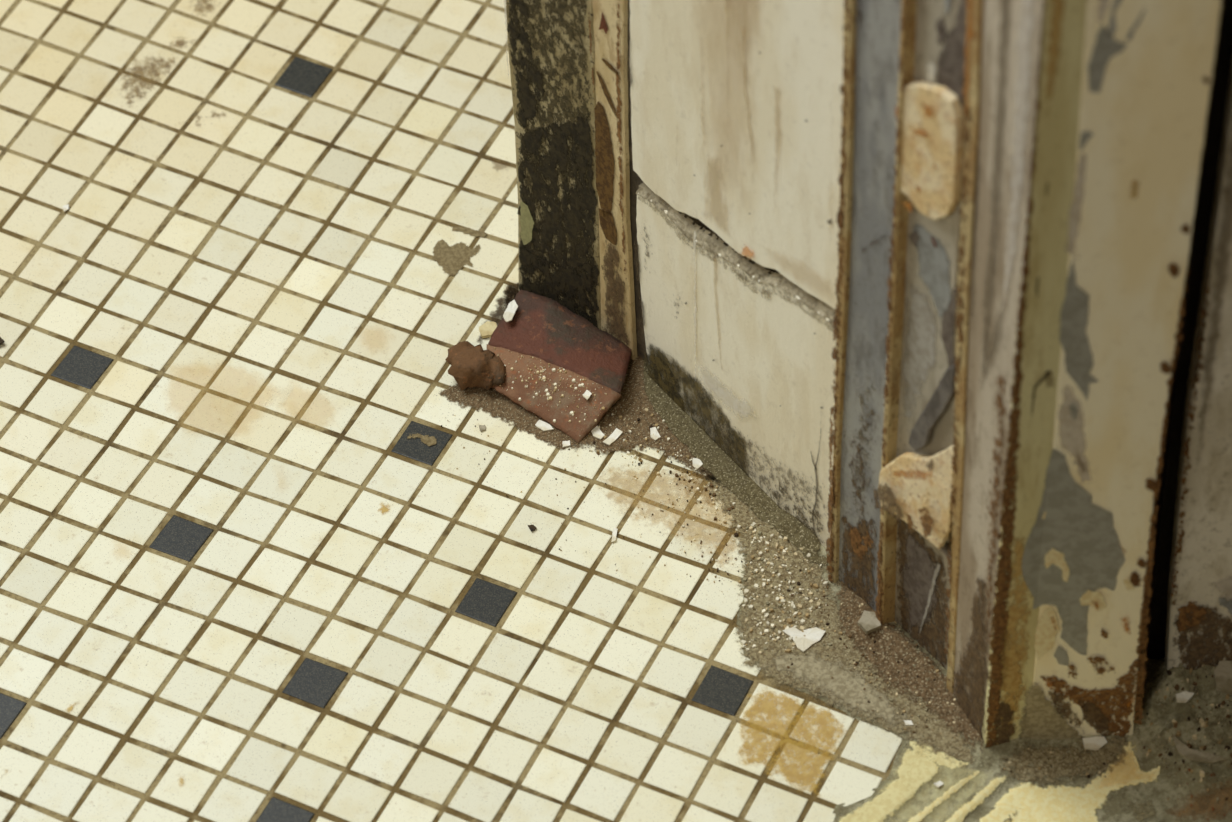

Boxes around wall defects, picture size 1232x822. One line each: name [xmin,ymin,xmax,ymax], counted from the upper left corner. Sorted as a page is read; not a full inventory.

mould [507,0,600,327]
peeling [503,300,518,322]
peeling [535,420,554,431]
peeling [591,426,623,446]
water stain [644,231,825,543]
crack [636,182,837,327]
rust [826,0,1046,748]
peeling [839,131,1161,822]
rust [1130,263,1232,725]
water stain [740,691,843,792]
peeling [1214,659,1232,695]